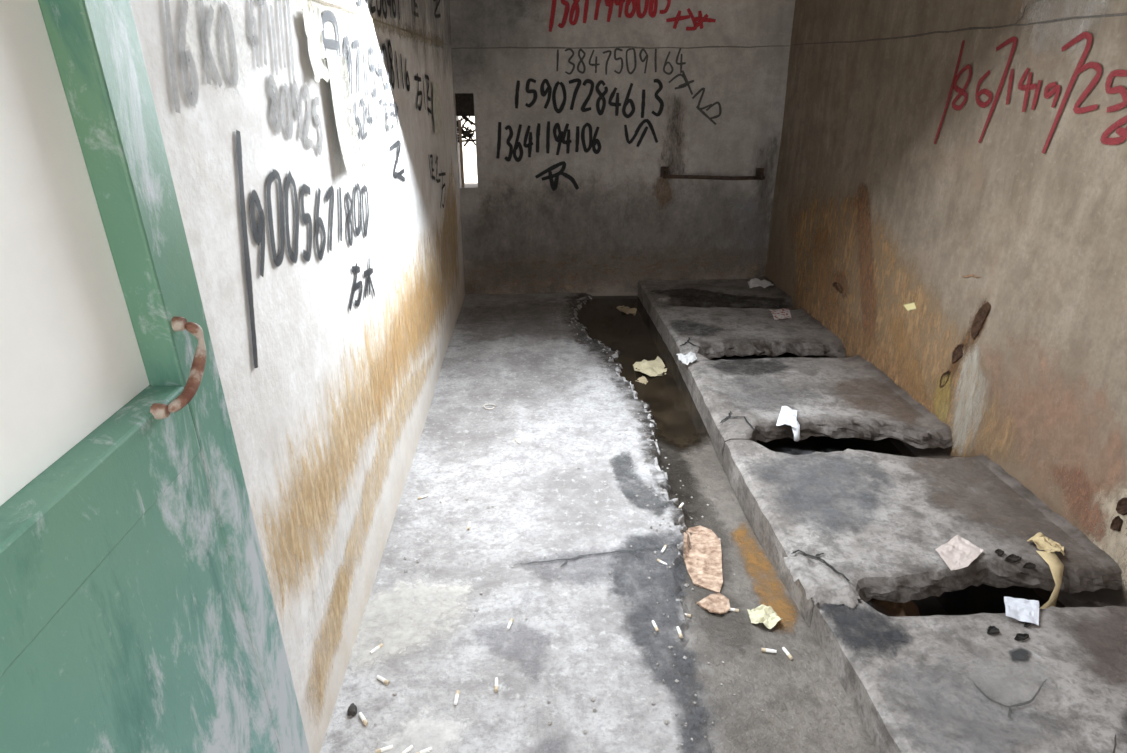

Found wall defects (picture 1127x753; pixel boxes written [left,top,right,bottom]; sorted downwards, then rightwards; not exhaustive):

corrosion [264,184,459,711]
damp [466,183,788,753]
spalling [1110,497,1127,531]
corrosion [732,524,796,627]
crack [968,677,1047,718]